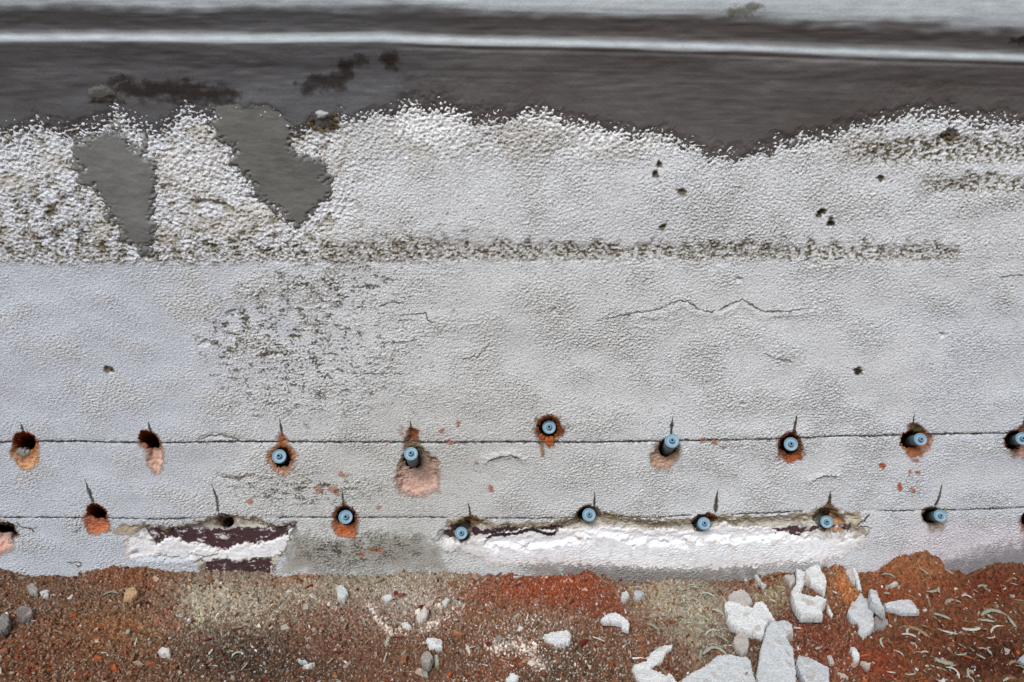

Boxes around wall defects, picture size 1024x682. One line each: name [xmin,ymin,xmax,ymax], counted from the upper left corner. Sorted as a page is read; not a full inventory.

water stain [111,73,242,104]
water stain [295,53,397,94]
hole [307,110,339,132]
crack [603,298,810,320]
corrosion [400,426,420,442]
corrosion [533,414,569,457]
flaking render [83,505,298,574]